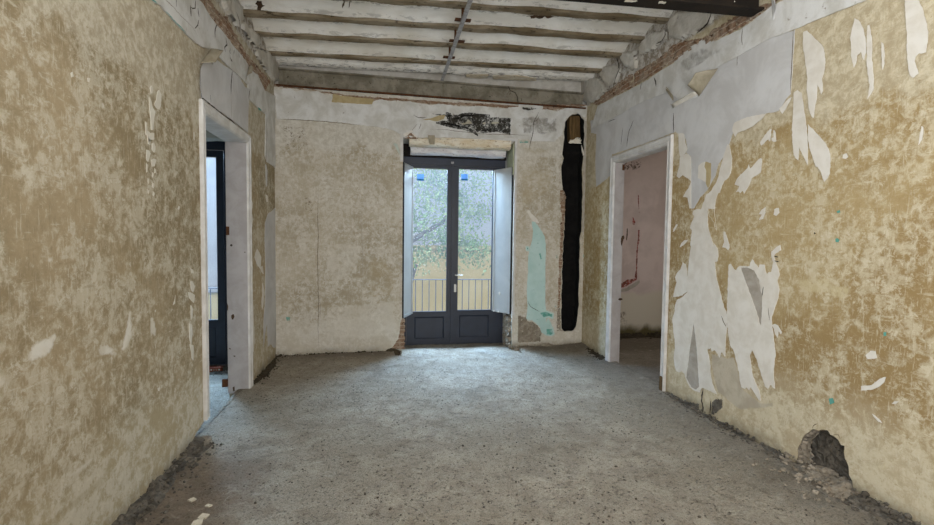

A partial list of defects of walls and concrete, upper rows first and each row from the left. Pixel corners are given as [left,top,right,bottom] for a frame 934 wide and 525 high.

crack [166,0,240,61]
flaking render [200,0,519,121]
peeling [741,268,762,324]
flaking render [686,324,776,415]
spalling [796,424,853,485]